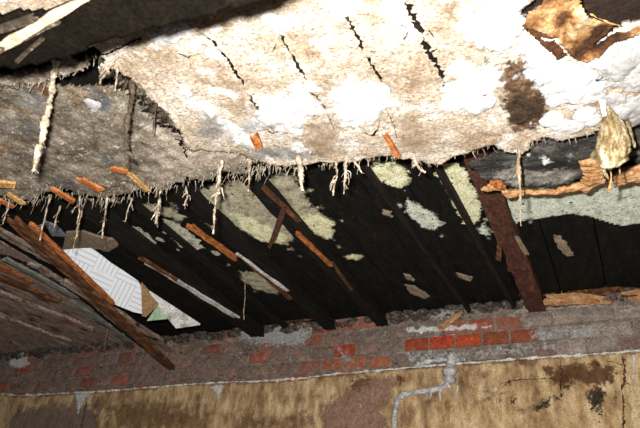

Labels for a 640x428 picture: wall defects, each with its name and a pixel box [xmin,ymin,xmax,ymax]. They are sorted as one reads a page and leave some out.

crack [344,15,382,83]
crack [400,2,448,96]
crack [202,33,260,111]
crack [273,33,336,134]
damp [368,156,416,188]
flaking render [515,236,529,256]
peeling [553,234,574,257]
peeling [138,256,178,282]
peeling [403,273,430,299]
damp [406,309,492,334]
damp [405,324,598,362]
damp [533,360,614,423]